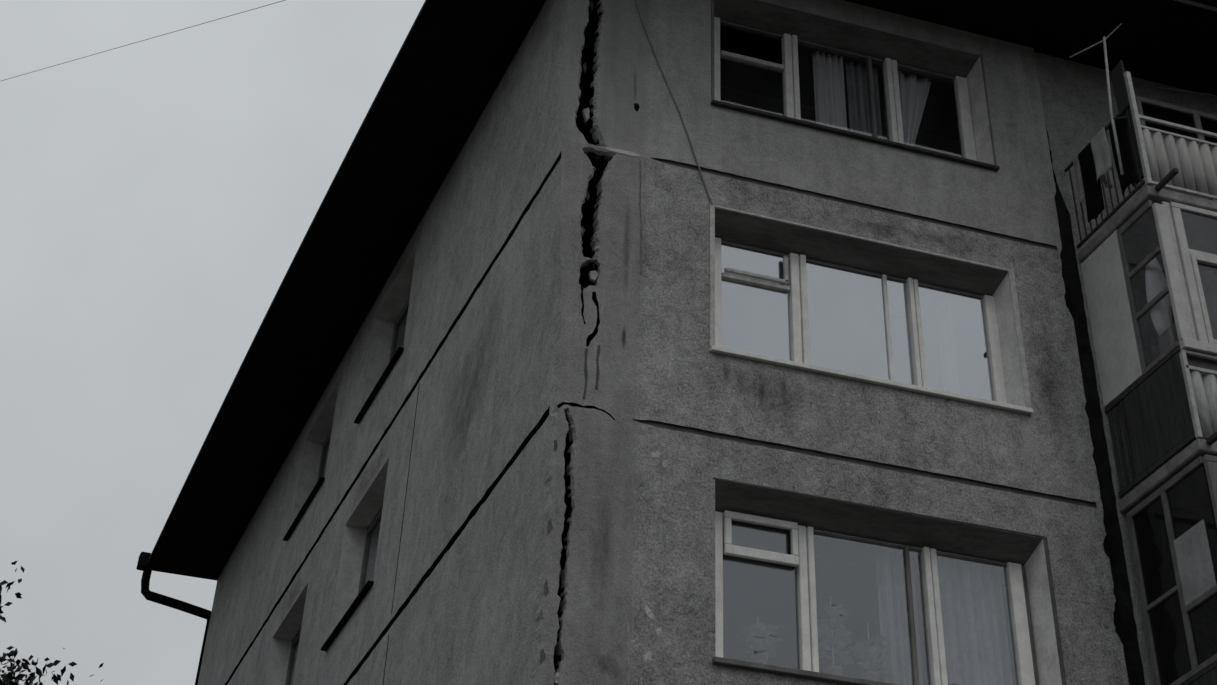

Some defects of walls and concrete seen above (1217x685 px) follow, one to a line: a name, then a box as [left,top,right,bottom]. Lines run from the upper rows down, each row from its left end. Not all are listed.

crack [553,0,642,685]